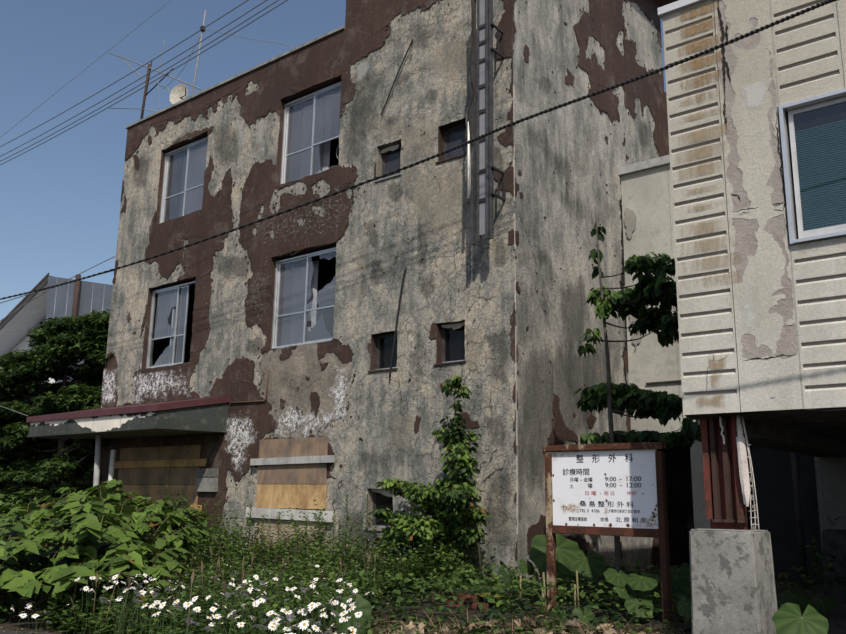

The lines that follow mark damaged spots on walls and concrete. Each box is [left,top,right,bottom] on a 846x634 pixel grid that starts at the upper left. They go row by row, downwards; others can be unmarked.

rust [681,3,720,98]
crack [717,0,731,130]
peeling [717,0,797,360]
crack [732,106,788,228]
peeling [30,0,662,585]
efflorescence [134,371,186,403]
efflorescence [226,418,257,470]
efflorescence [275,368,347,438]